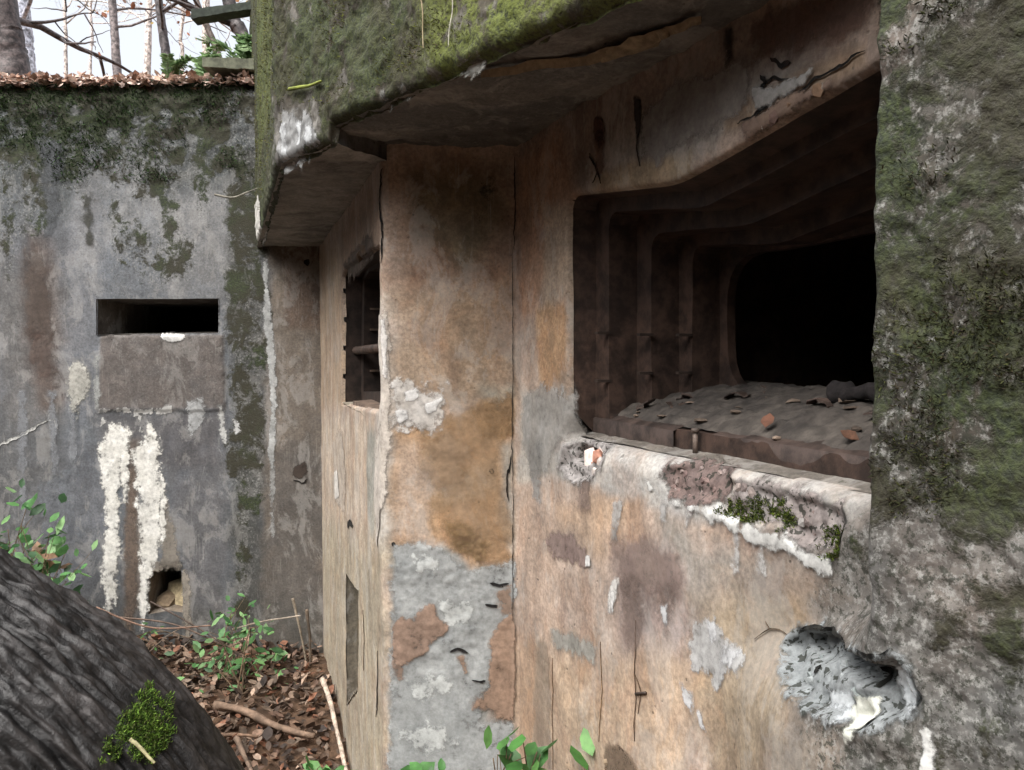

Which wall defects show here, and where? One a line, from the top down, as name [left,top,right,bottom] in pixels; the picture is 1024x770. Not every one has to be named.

peeling [633,60,832,167]
crack [737,51,863,124]
water stain [40,139,64,237]
water stain [82,196,93,245]
water stain [17,391,28,526]
water stain [39,356,193,644]
peeling [374,310,448,545]
spalling [556,438,615,486]
spalling [658,456,847,554]
spalling [387,541,517,770]
spalling [777,619,922,736]